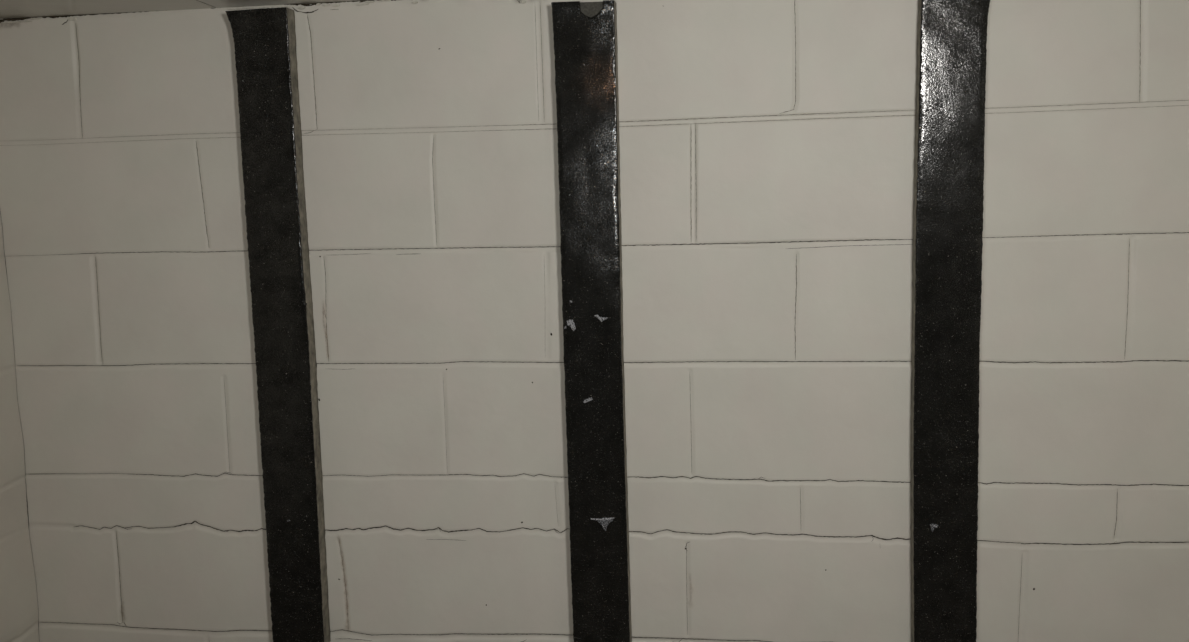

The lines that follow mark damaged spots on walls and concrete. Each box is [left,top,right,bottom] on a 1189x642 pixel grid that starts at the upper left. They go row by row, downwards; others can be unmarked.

crack [0,11,240,252]
crack [619,1,915,363]
crack [985,0,1188,114]
crack [285,0,568,642]
crack [980,232,1189,363]
crack [0,212,269,632]
crack [634,622,770,642]
crack [629,444,910,587]
crack [977,482,1189,634]